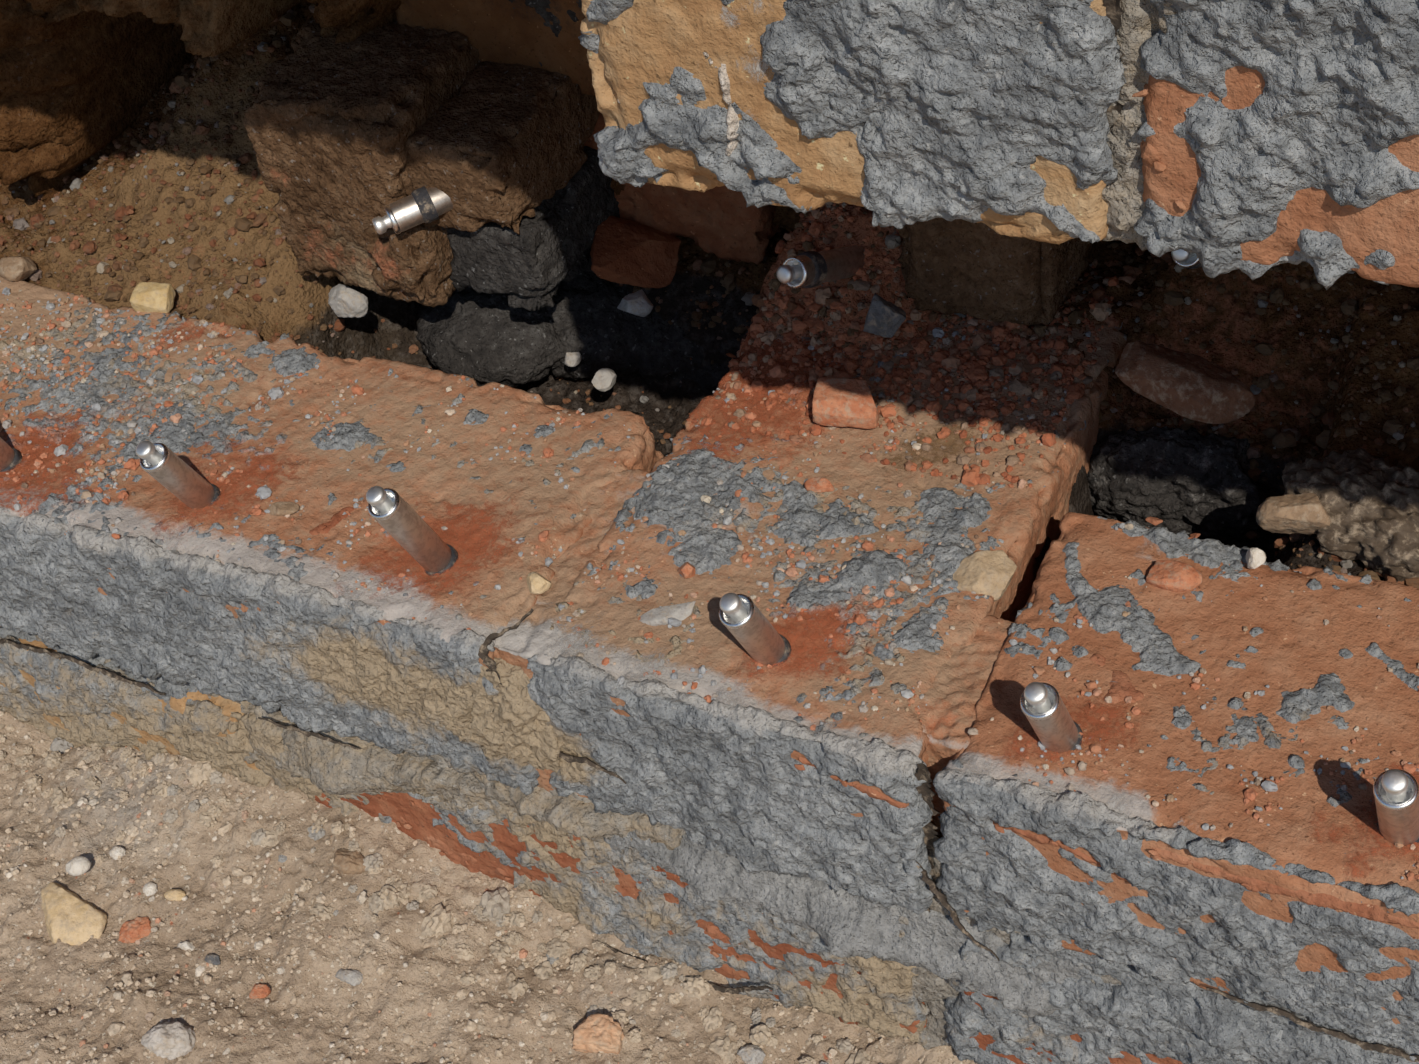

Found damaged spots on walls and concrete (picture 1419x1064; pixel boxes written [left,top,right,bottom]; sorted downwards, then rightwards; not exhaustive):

crack [1103,0,1124,140]
spalling [362,61,681,311]
spalling [1140,142,1167,172]
spalling [130,282,176,313]
crack [478,608,533,687]
spalling [396,801,511,881]
crack [915,763,999,961]
spalling [993,822,1127,885]
spalling [1148,847,1419,929]